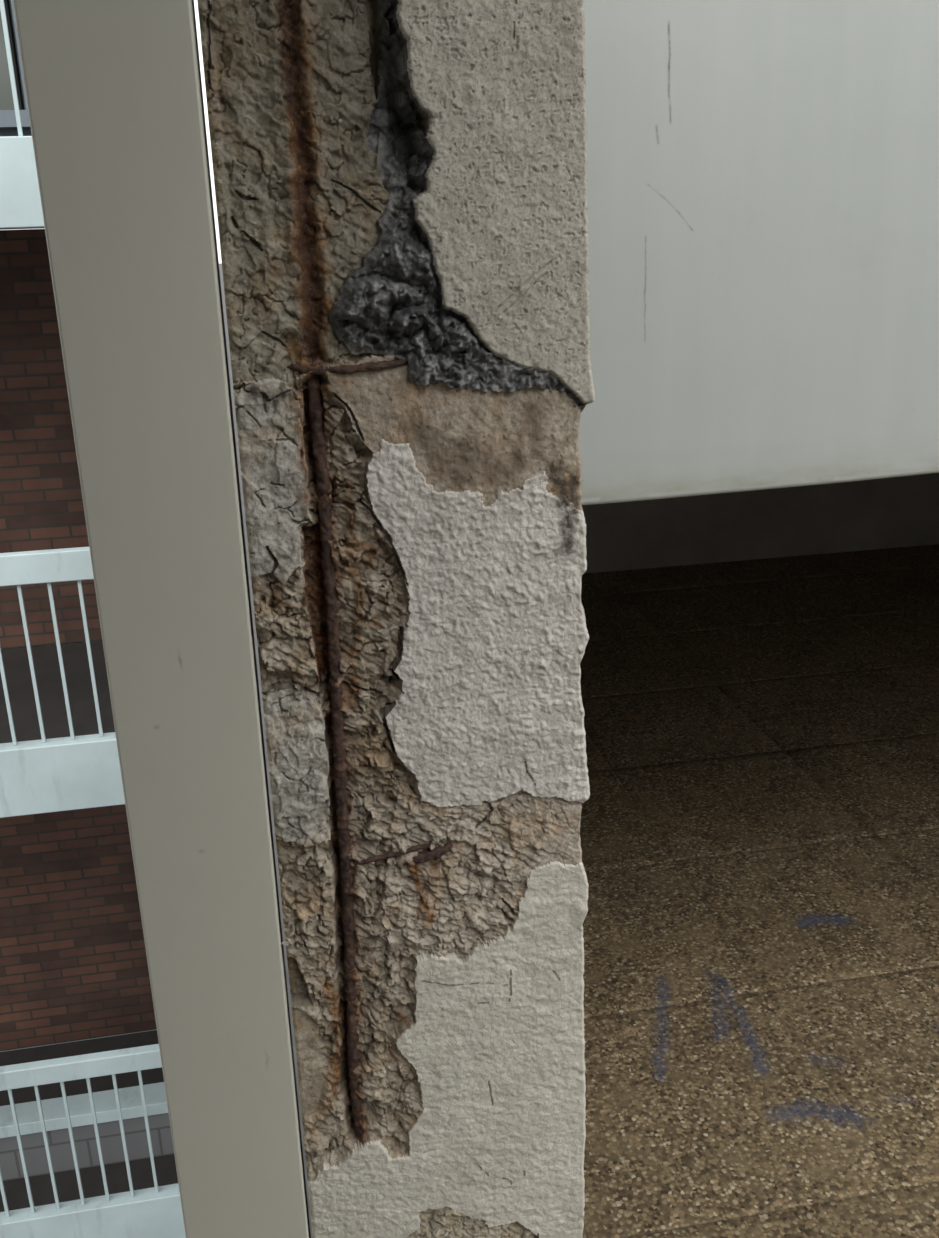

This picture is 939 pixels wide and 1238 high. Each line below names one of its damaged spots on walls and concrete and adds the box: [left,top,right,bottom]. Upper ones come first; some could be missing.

crack [204,0,212,90]
crack [230,190,264,253]
corrosion [277,0,331,358]
crack [330,179,381,214]
crack [260,330,288,350]
damp [570,476,579,513]
spalling [197,0,583,1182]
spalling [406,1206,537,1238]